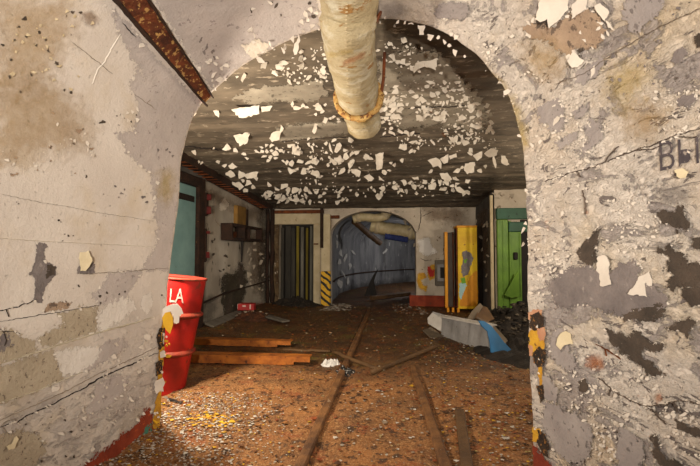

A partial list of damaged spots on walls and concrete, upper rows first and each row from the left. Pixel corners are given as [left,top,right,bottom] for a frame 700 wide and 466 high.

peeling [0,8,200,404]
peeling [156,0,509,214]
peeling [521,0,614,86]
crack [544,128,700,214]
crack [1,347,158,438]
peeling [521,164,700,466]